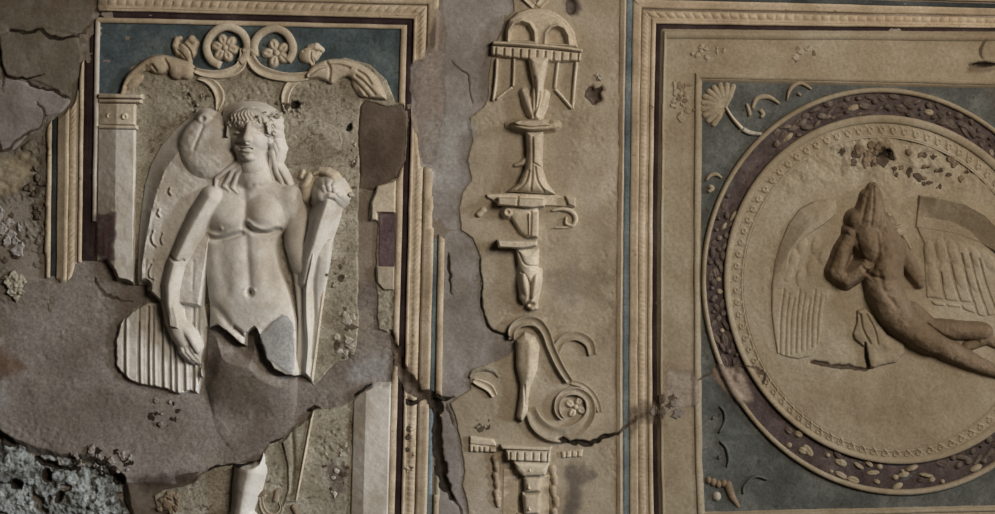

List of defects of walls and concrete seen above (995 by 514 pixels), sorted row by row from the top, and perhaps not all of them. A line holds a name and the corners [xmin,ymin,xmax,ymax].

spalling [585,73,603,105]
spalling [839,141,969,189]
spalling [0,134,47,310]
crack [354,384,372,396]
crack [390,332,462,514]
crack [559,412,648,447]
spalling [42,443,134,485]
crack [208,461,256,471]